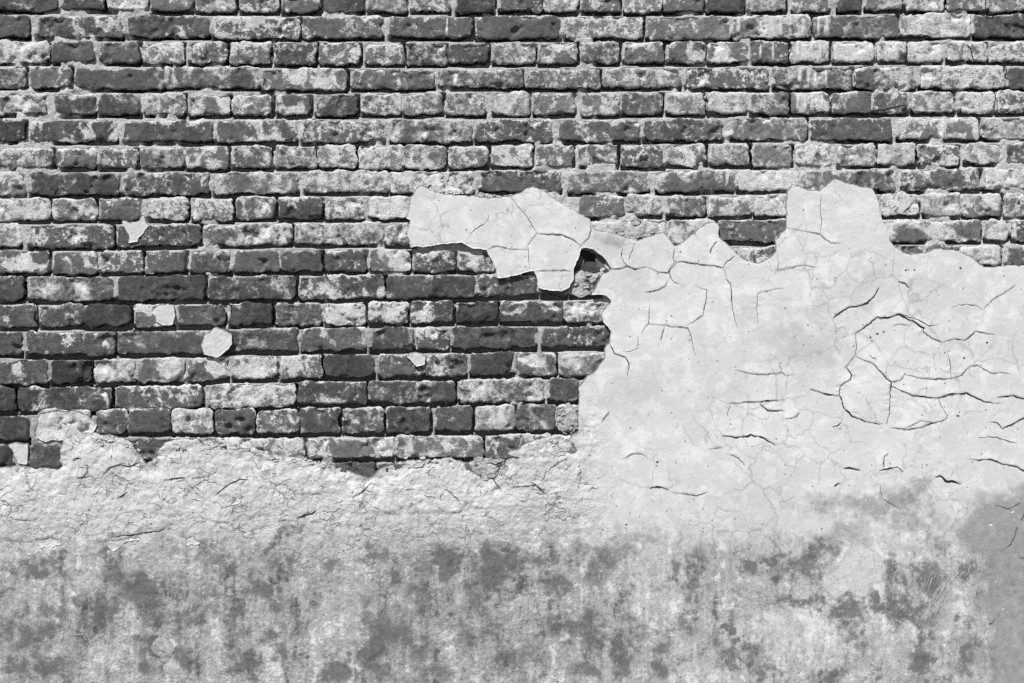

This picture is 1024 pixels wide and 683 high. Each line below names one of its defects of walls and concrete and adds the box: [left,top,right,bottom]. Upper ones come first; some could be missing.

spalling [570,250,609,297]
crack [609,241,818,375]
crack [812,281,1024,471]
peeling [77,432,141,466]
spalling [157,438,330,467]
spalling [397,402,578,480]
crack [710,400,800,465]
crack [834,456,901,510]
damp [739,538,839,579]
damp [0,547,307,683]
damp [710,610,771,682]
damp [779,555,973,647]